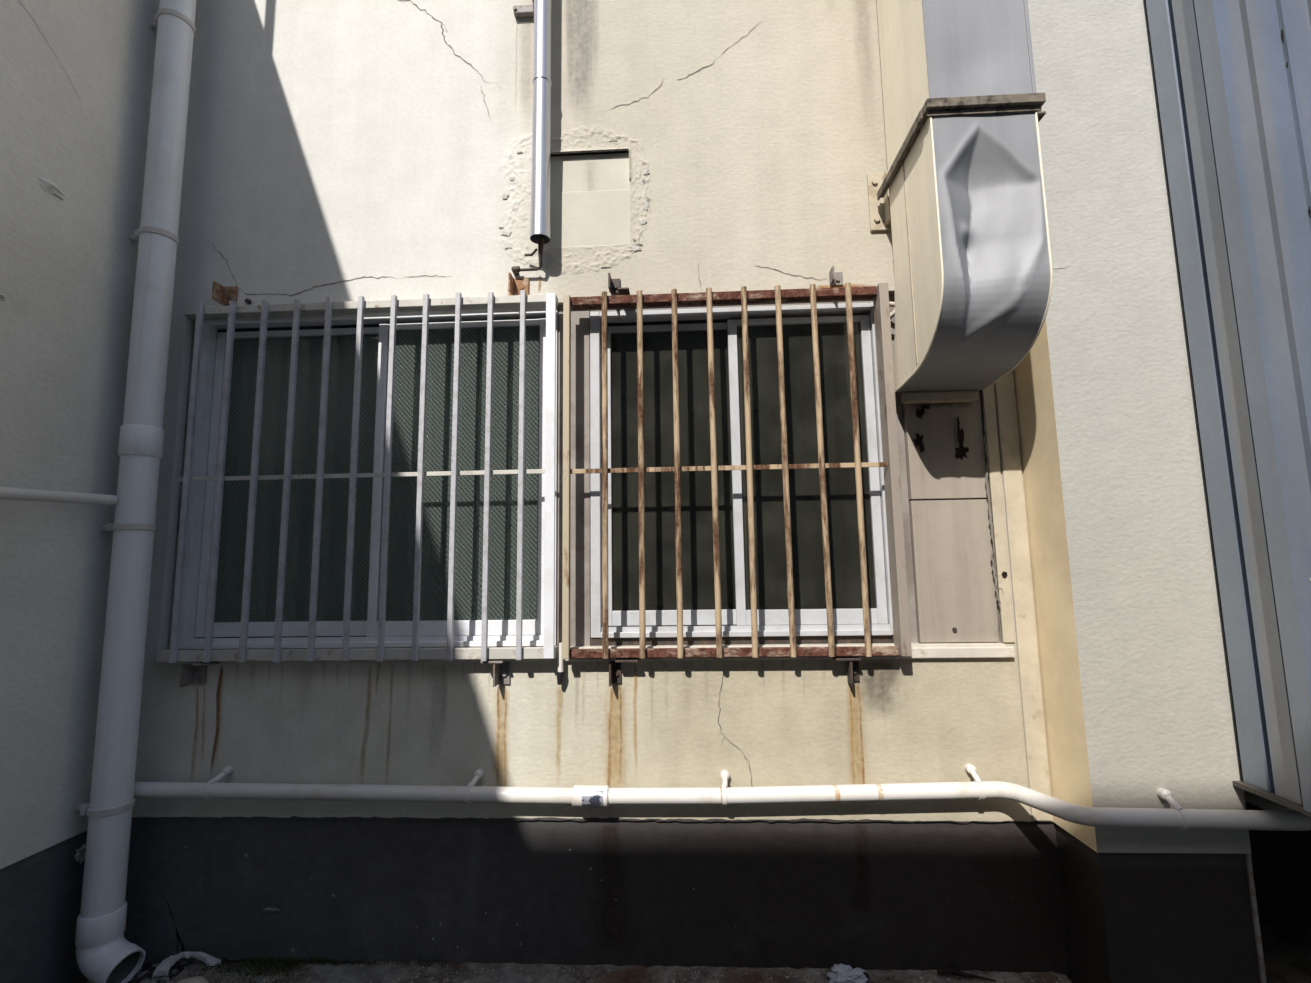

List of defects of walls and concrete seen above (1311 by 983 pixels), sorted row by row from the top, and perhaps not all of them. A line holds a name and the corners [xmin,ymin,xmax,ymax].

crack [400,0,498,120]
crack [612,22,761,109]
flaking render [496,125,652,275]
crack [211,243,448,296]
rust [211,668,223,764]
rust [608,669,636,786]
crack [718,665,753,810]